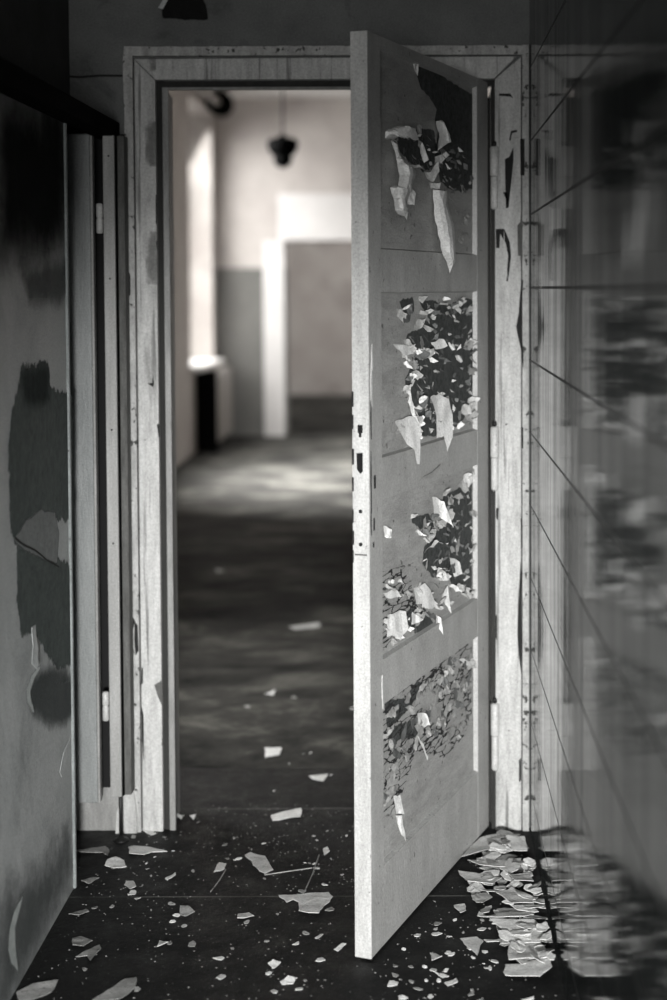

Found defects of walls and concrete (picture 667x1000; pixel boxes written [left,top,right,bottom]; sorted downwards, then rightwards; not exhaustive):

peeling [385,64,474,273]
peeling [8,360,74,670]